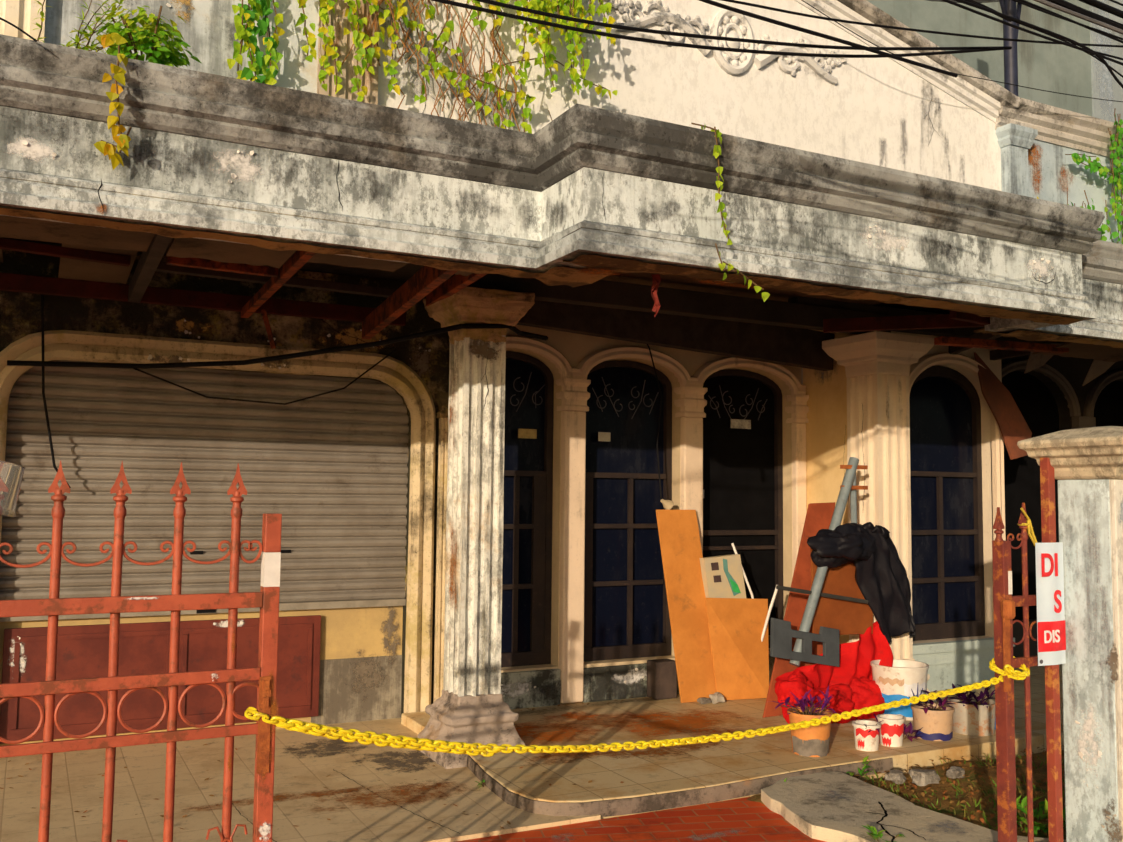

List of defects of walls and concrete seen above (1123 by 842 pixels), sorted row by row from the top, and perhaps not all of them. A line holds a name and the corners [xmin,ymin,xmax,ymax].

damp [387,15,518,127]
rust [1028,144,1041,192]
damp [352,606,400,697]
rust [516,711,741,765]
crack [866,801,926,842]